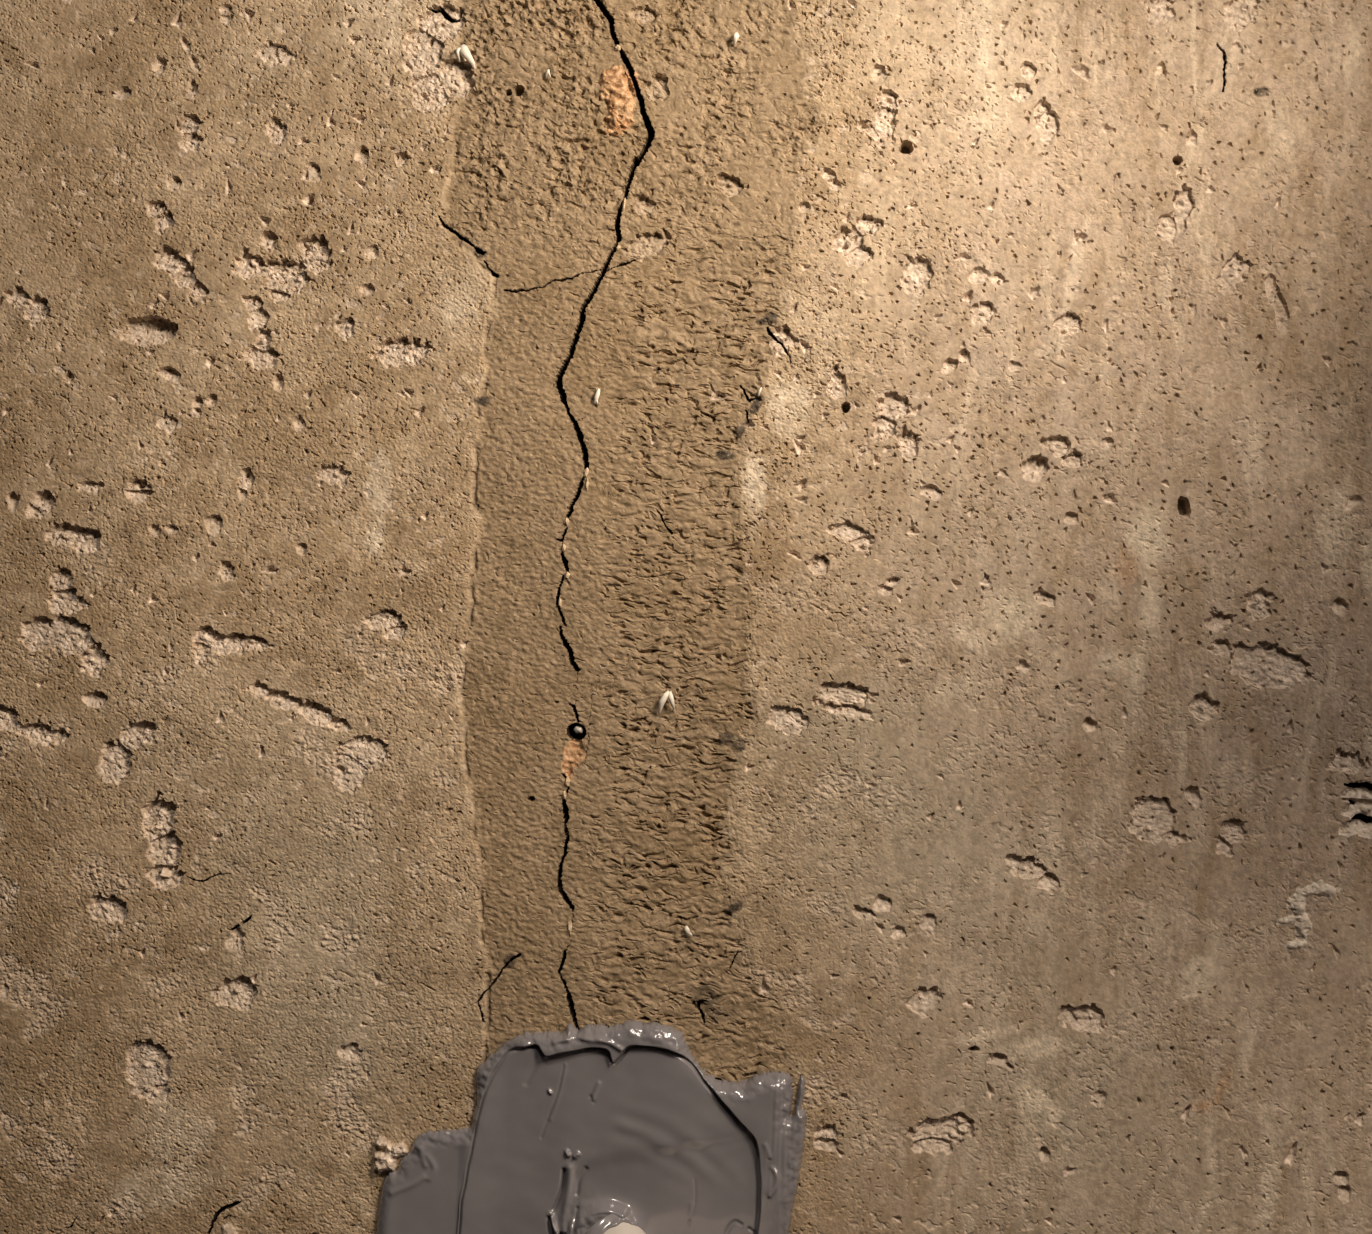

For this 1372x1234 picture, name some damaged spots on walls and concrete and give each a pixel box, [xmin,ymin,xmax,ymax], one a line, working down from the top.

corrosion [597,63,644,139]
crack [438,0,655,1030]
corrosion [560,739,587,789]